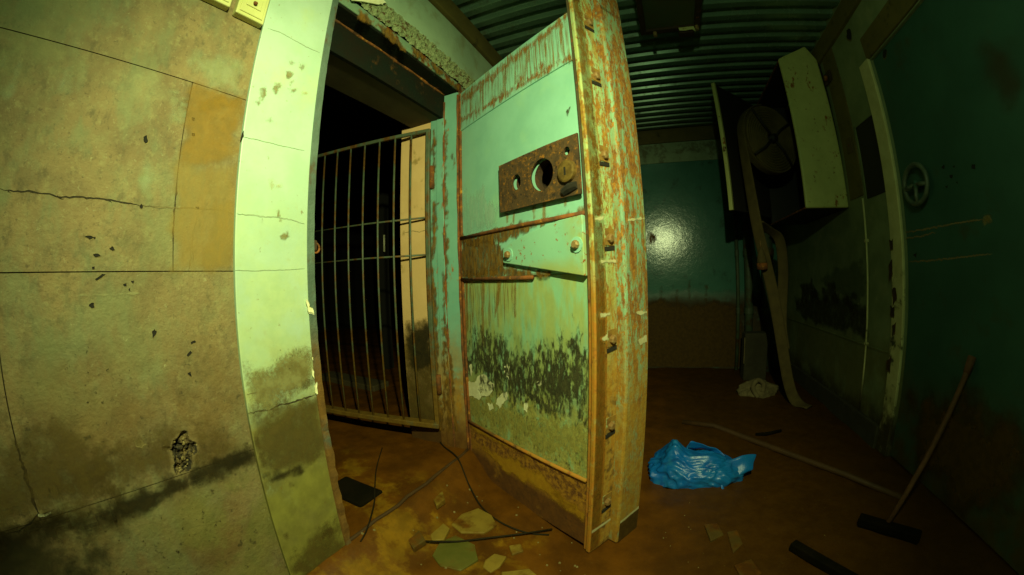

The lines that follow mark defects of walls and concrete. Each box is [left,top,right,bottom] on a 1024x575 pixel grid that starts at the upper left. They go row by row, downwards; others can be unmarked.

flaking render [352,0,475,89]
corrosion [357,10,573,121]
crack [0,188,304,241]
corrosion [431,120,556,431]
peeling [468,364,508,410]
damp [467,330,589,456]
crack [1,442,53,534]
damp [0,349,324,575]
spalling [162,430,198,474]